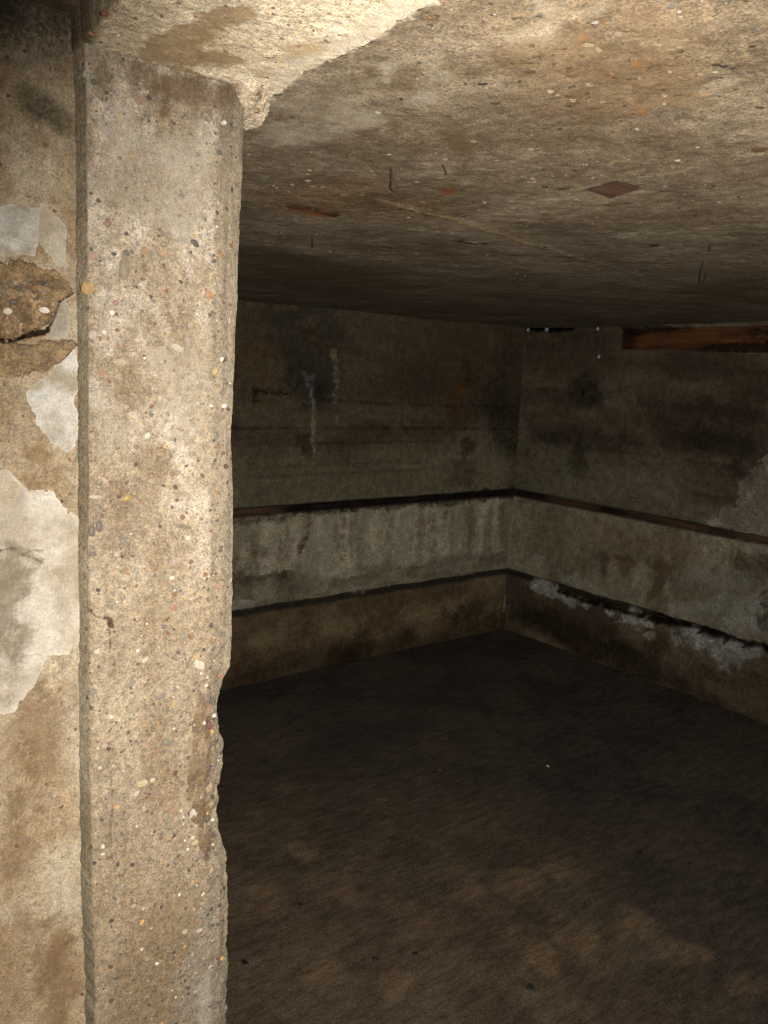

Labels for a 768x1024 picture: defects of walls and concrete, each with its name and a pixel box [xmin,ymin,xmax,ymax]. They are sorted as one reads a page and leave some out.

water stain [127,6,255,121]
spalling [0,203,78,452]
peeling [0,469,114,715]
water stain [442,545,768,694]